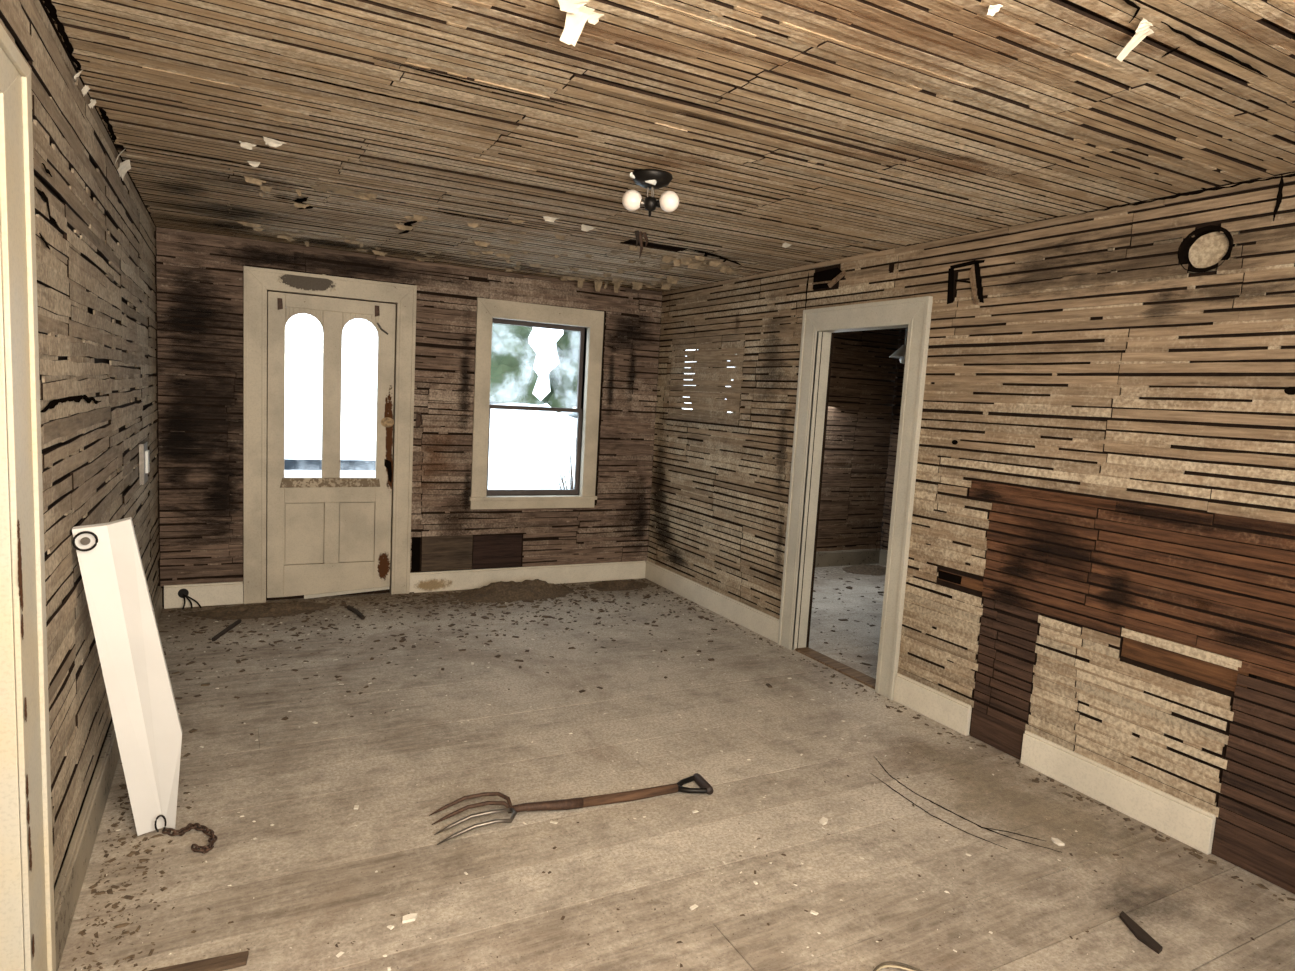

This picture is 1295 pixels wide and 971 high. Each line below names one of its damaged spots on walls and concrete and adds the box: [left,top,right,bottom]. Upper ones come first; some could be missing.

corrosion [377,553,390,581]